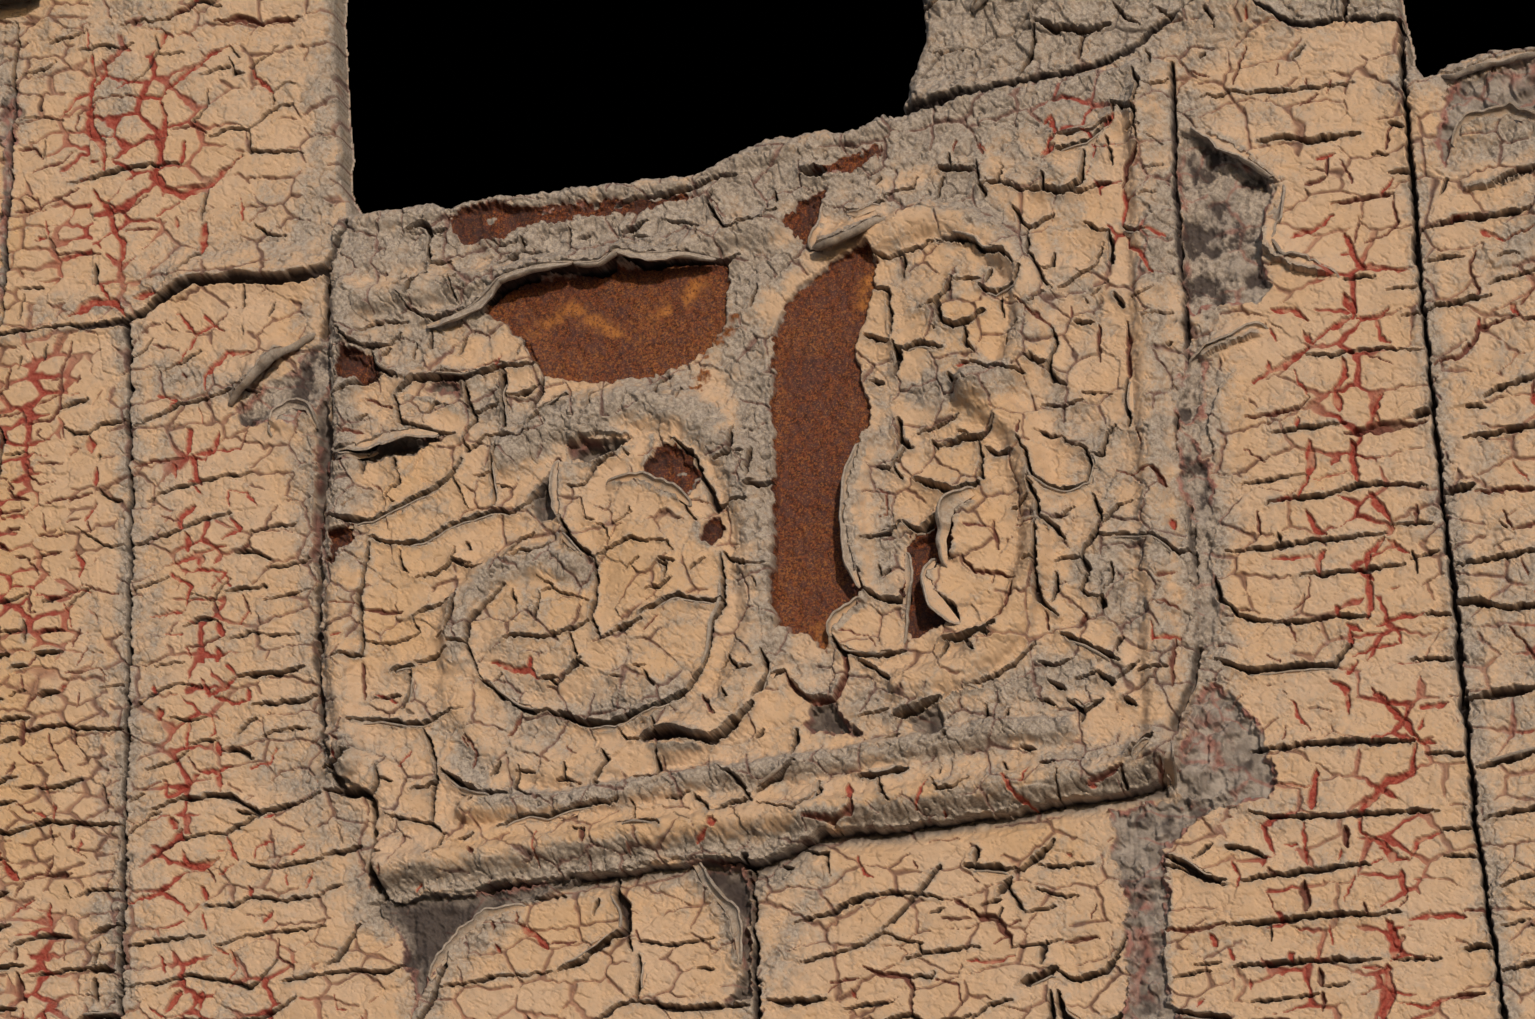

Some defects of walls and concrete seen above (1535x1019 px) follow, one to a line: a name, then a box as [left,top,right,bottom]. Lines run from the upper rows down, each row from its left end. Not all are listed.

crack [1,0,304,326]
peeling [448,193,700,256]
crack [805,165,827,177]
peeling [225,321,471,581]
rust [426,248,758,403]
peeling [531,414,727,552]
rust [770,216,887,668]
peeling [1172,120,1342,658]
crack [0,172,1129,1019]
peeling [901,486,990,645]
peeling [790,668,863,738]
crack [1001,736,1166,815]